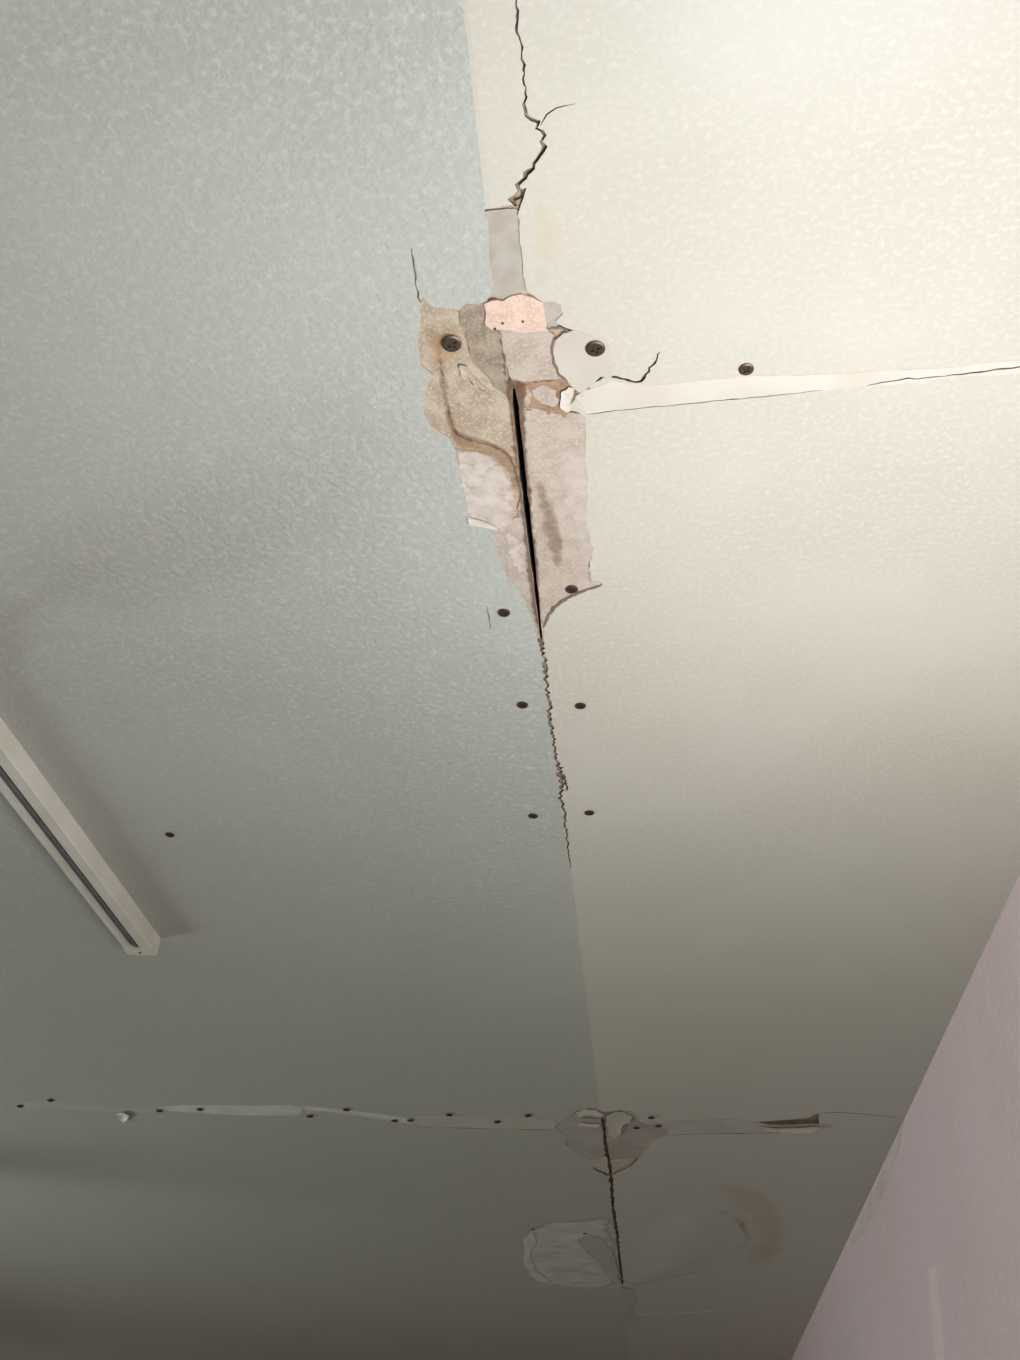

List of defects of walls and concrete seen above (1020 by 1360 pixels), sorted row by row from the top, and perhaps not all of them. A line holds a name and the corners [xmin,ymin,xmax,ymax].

crack [509,0,573,207]
water stain [448,341,562,628]
spalling [418,188,613,653]
crack [513,389,571,867]
crack [582,1116,639,1282]
spalling [413,1108,831,1174]